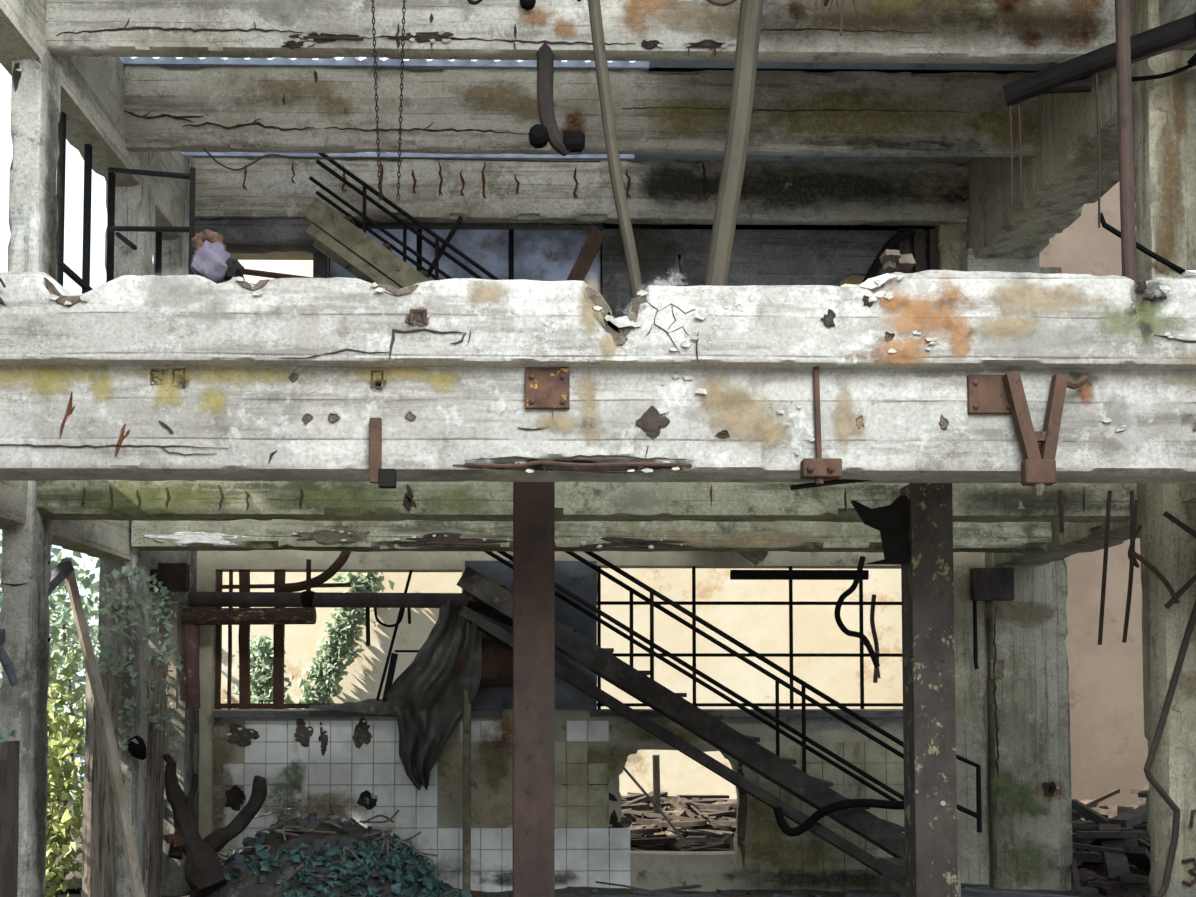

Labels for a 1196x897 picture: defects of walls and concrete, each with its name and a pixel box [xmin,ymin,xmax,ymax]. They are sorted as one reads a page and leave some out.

crack [56,18,303,36]
corrosion [624,0,677,31]
crack [124,93,528,134]
leakage [782,92,1039,158]
leakage [1159,54,1187,278]
leakage [740,167,969,209]
spalling [44,277,90,308]
spalling [234,277,270,296]
spalling [585,286,707,351]
crack [645,299,699,363]
corrosion [858,284,972,362]
spalling [292,718,329,756]